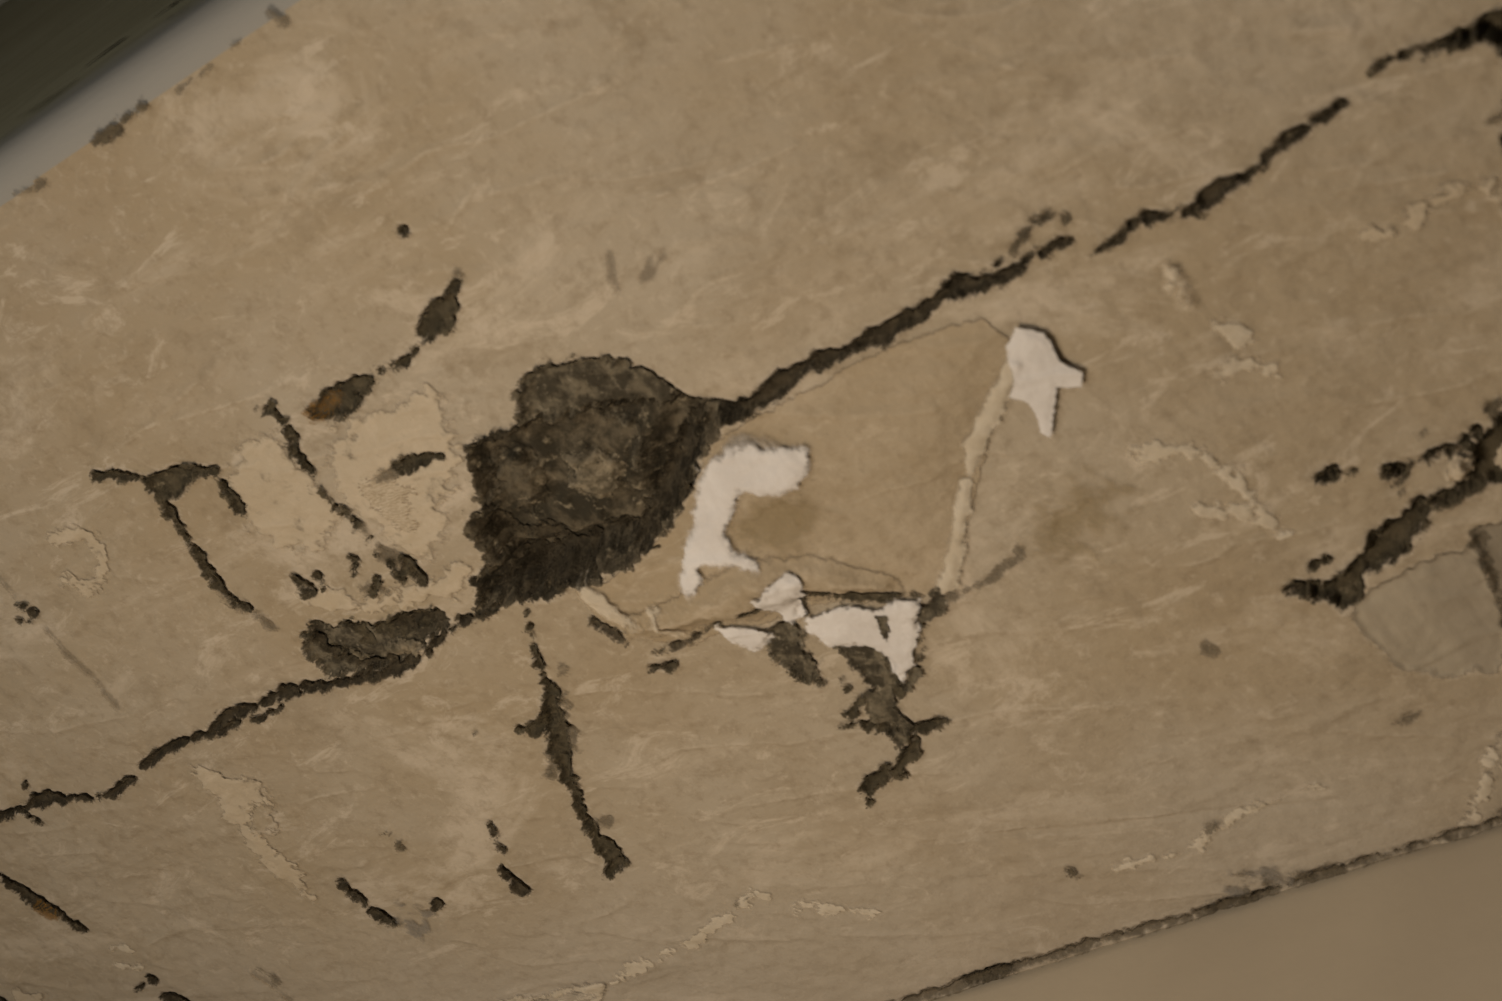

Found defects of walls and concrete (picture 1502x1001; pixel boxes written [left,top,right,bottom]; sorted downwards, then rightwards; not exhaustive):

spalling [1366,9,1502,78]
crack [717,99,1348,426]
peeling [1358,177,1502,242]
crack [89,464,275,631]
crack [254,271,472,601]
spalling [226,355,747,679]
spalling [1281,399,1502,679]
crack [0,874,88,933]
crack [0,599,630,881]
crack [335,878,397,927]
crack [486,823,531,897]
crack [587,549,1024,809]